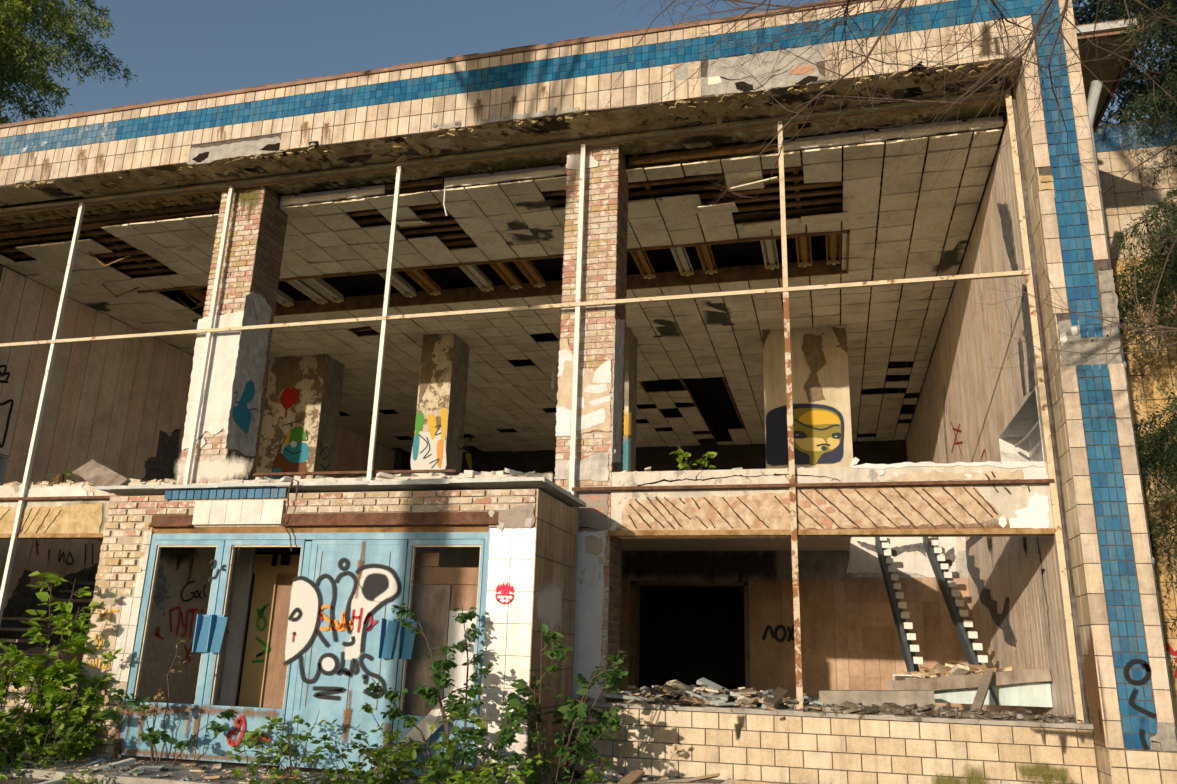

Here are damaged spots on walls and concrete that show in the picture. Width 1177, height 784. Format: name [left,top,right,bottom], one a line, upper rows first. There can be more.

spalling [147,137,396,197]
spalling [349,107,592,167]
damp [525,117,570,134]
flaking render [566,155,609,170]
damp [679,135,732,151]
spalling [634,43,845,133]
damp [765,92,815,111]
spalling [856,58,1016,105]
flaking render [143,292,329,484]
peeling [418,334,440,406]
spalling [554,319,1049,699]